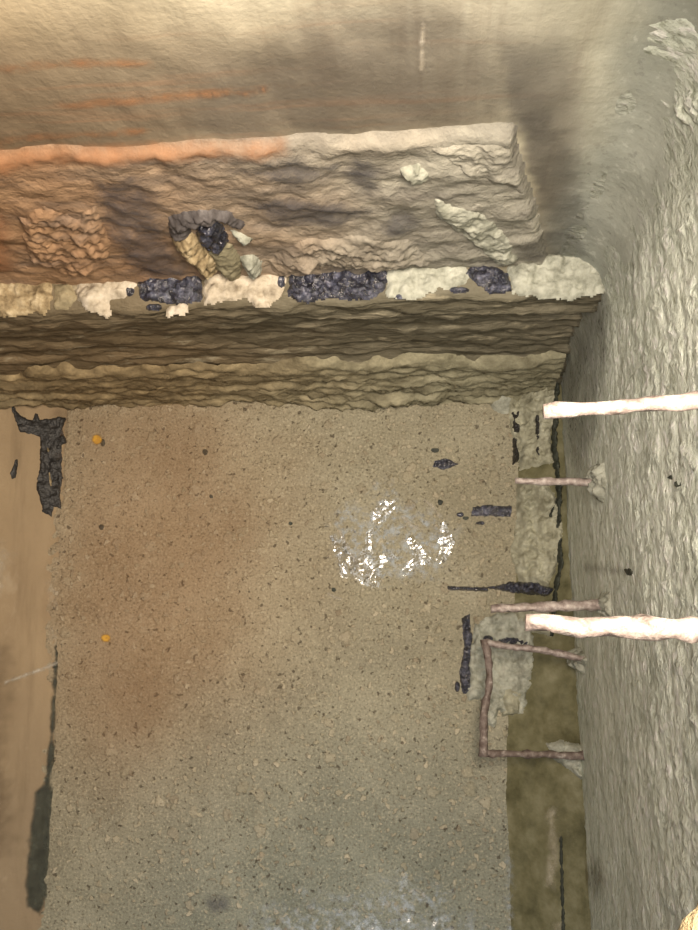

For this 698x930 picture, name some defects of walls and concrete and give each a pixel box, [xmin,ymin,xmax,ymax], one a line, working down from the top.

flaking render [643,18,698,65]
flaking render [661,90,698,128]
spalling [168,209,262,281]
peeling [509,387,563,587]
peeling [455,611,552,728]
crack [26,645,58,912]